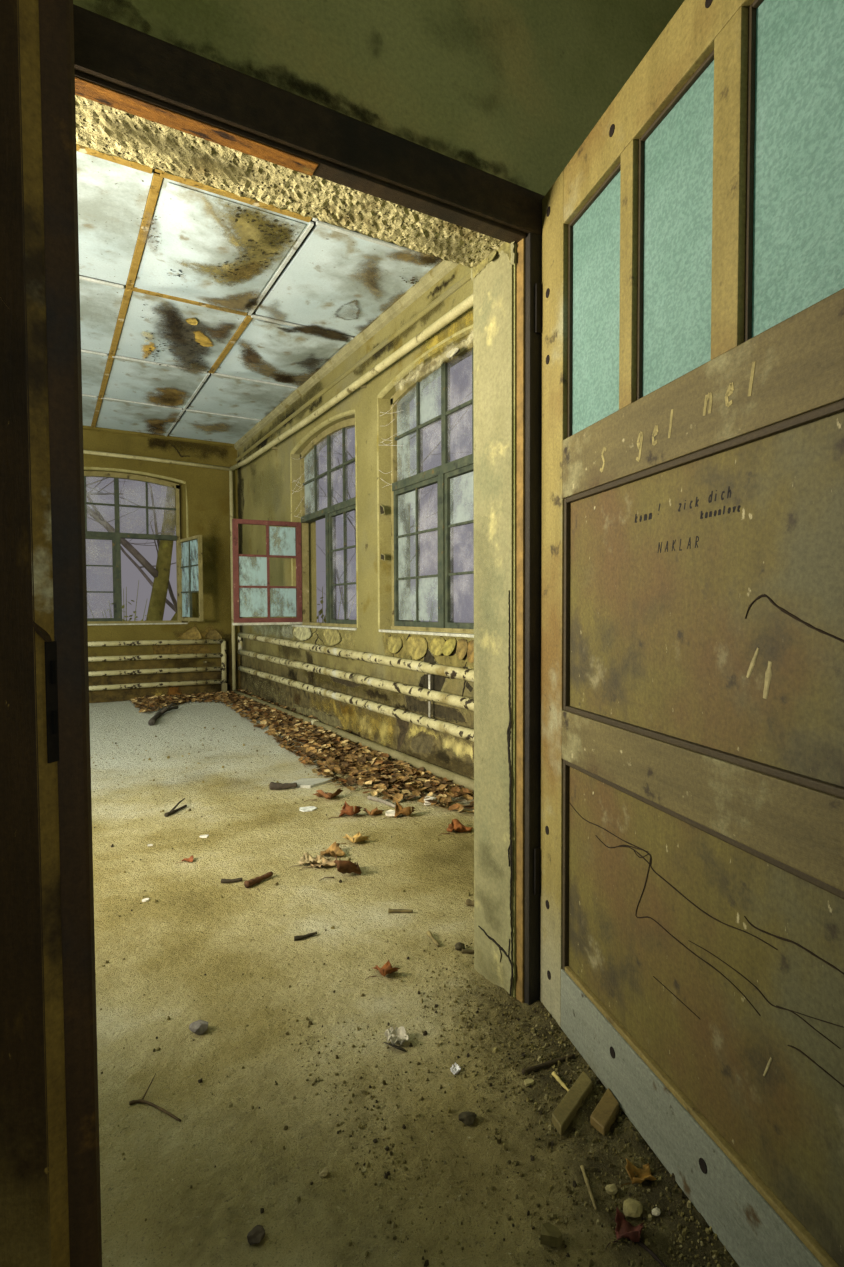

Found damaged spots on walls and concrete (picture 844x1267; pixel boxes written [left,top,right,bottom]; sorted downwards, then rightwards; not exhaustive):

water stain [399,332,473,389]
water stain [142,199,454,705]
crack [745,594,844,643]
water stain [404,727,474,776]
crack [569,802,844,1087]